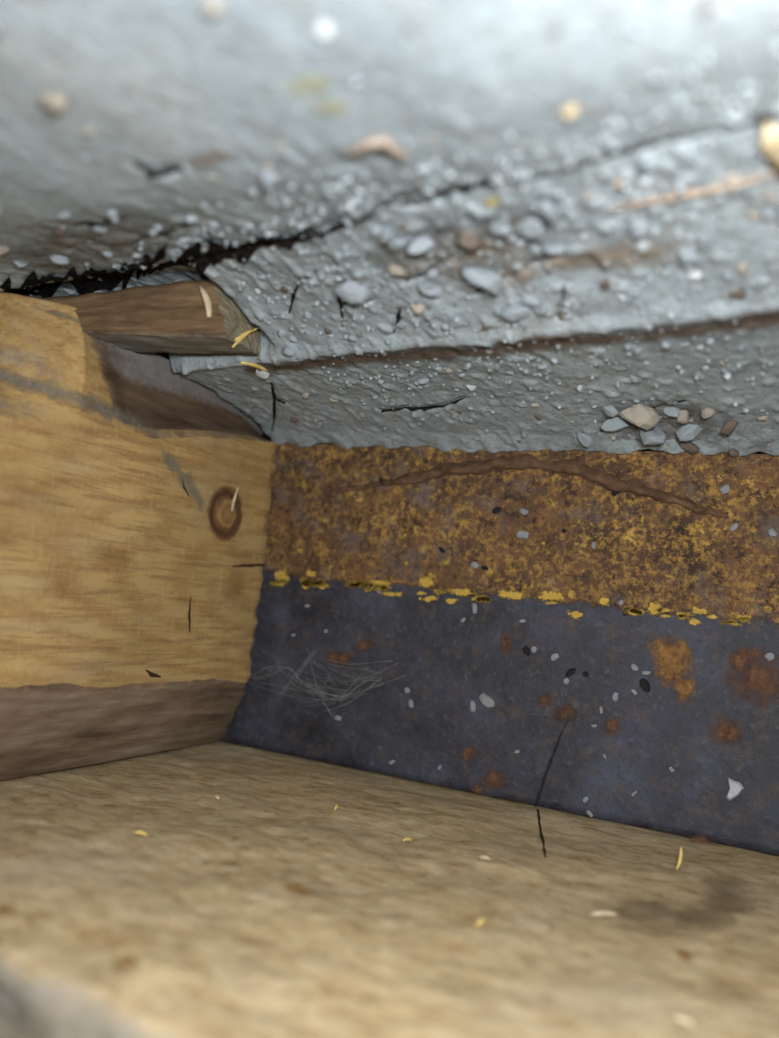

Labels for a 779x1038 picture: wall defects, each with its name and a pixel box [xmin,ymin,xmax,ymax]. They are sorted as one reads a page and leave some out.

crack [0,115,779,298]
crack [288,271,317,313]
crack [336,279,374,327]
crack [393,307,402,334]
rust [262,443,779,626]
rust [651,639,694,701]